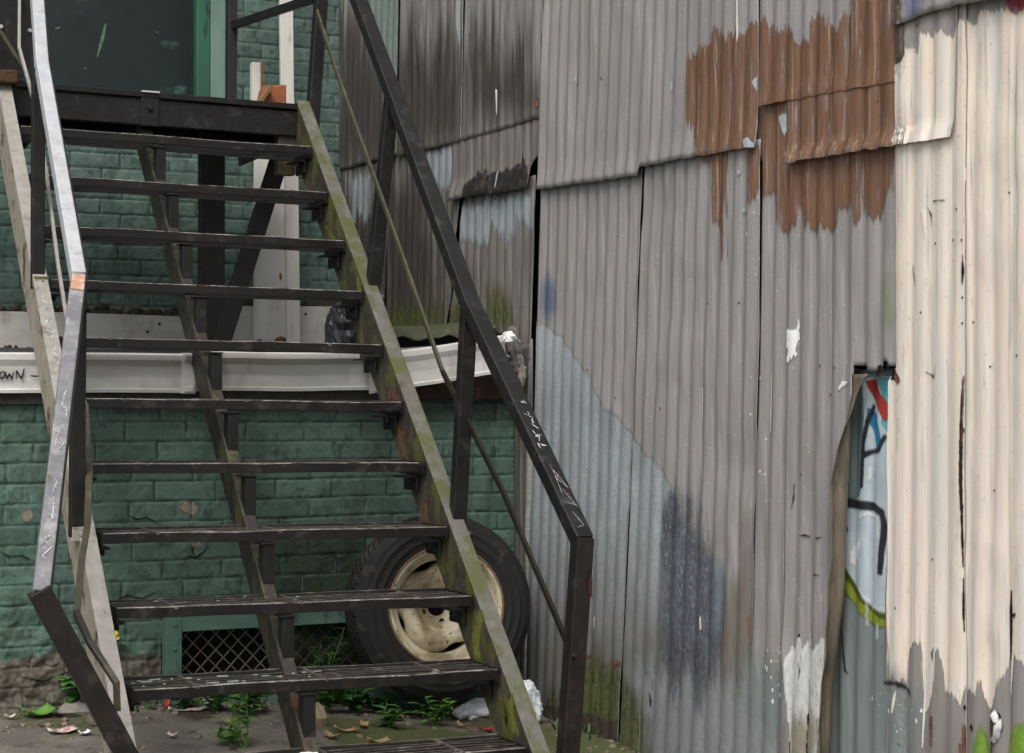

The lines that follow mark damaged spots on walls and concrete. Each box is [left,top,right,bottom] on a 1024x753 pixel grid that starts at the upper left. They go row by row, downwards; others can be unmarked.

leakage [399,0,537,148]
leakage [462,153,528,197]
spalling [178,502,199,515]
crack [957,379,965,632]
peeling [783,629,825,753]